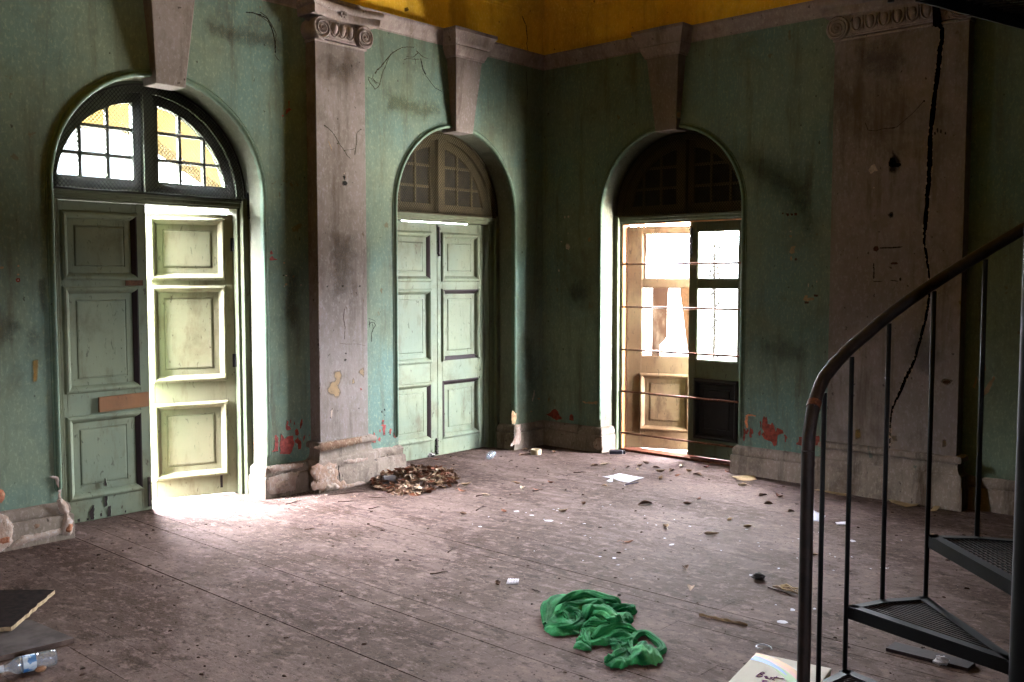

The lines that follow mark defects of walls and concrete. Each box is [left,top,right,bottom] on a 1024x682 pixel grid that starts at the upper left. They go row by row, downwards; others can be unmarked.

crack [889,6,945,448]
spalling [254,409,397,494]
spalling [328,368,364,419]
peeling [742,413,802,447]
spalling [0,476,112,552]